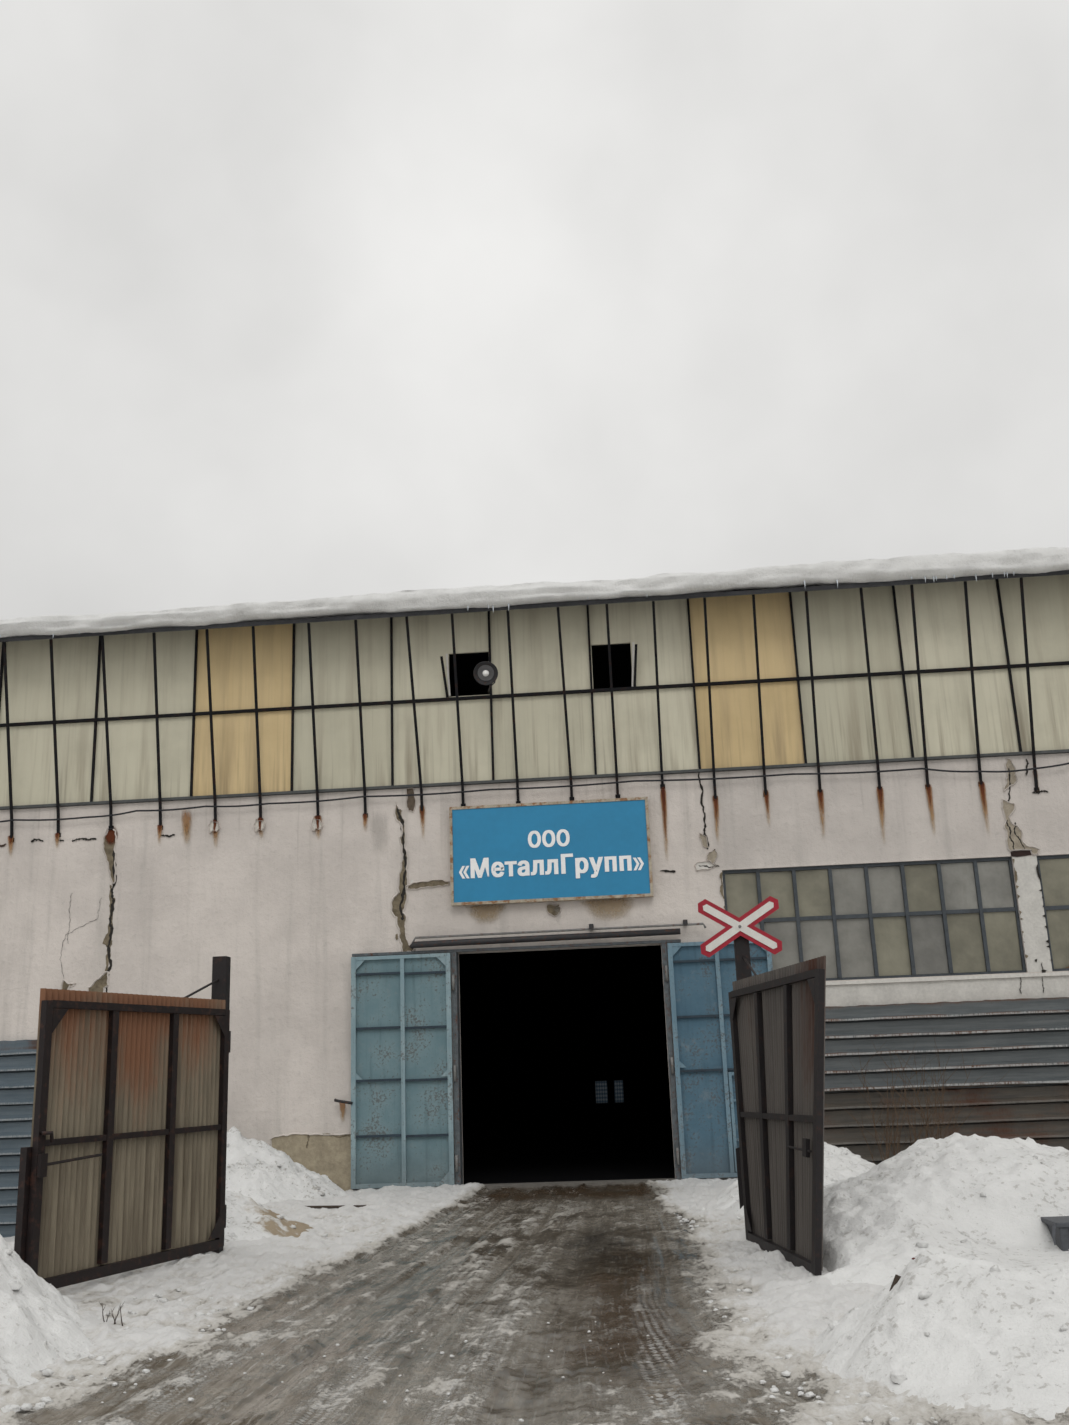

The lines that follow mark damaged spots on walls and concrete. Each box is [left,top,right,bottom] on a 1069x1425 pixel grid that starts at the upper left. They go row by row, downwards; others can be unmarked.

rust [926,784,934,824]
rust [979,782,988,823]
crack [390,802,450,952]
crack [0,828,117,992]
flaking render [61,971,110,992]